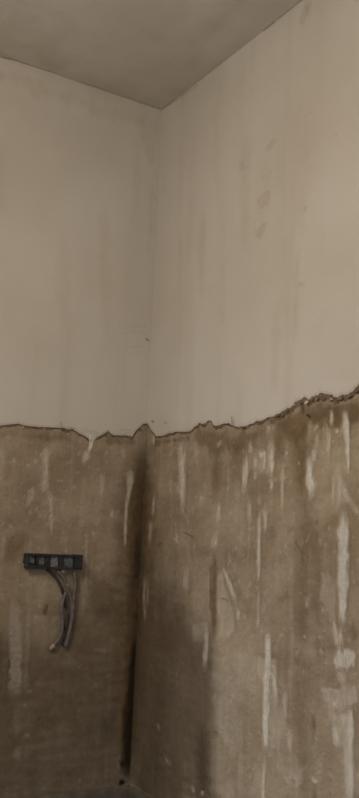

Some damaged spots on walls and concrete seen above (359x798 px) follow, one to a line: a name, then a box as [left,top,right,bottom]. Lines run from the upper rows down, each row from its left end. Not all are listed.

efflorescence [83,434,97,462]
efflorescence [243,448,274,488]
flaking render [0,385,359,798]
water stain [212,563,235,628]
efflorescence [257,513,266,576]
efflorescence [338,518,348,619]
water stain [119,475,212,798]
efflorescence [334,626,355,668]
efflorescence [263,639,277,746]
efflorescence [334,712,353,793]